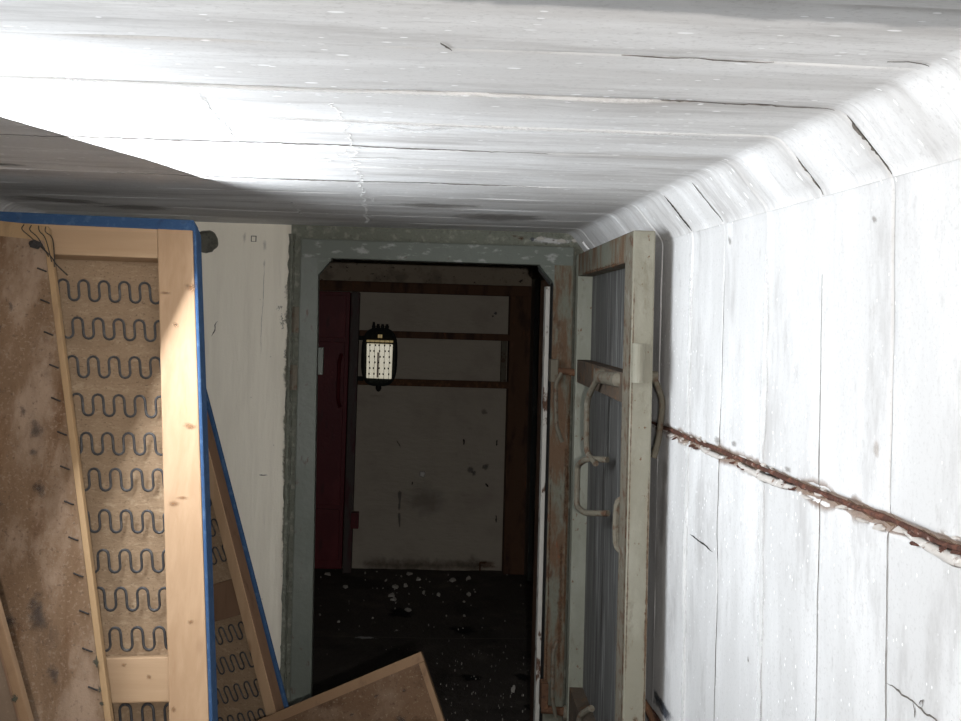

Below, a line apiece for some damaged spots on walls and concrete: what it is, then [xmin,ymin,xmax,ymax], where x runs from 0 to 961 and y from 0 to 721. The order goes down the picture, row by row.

crack [0,103,545,224]
spalling [651,293,961,721]
crack [885,570,937,721]